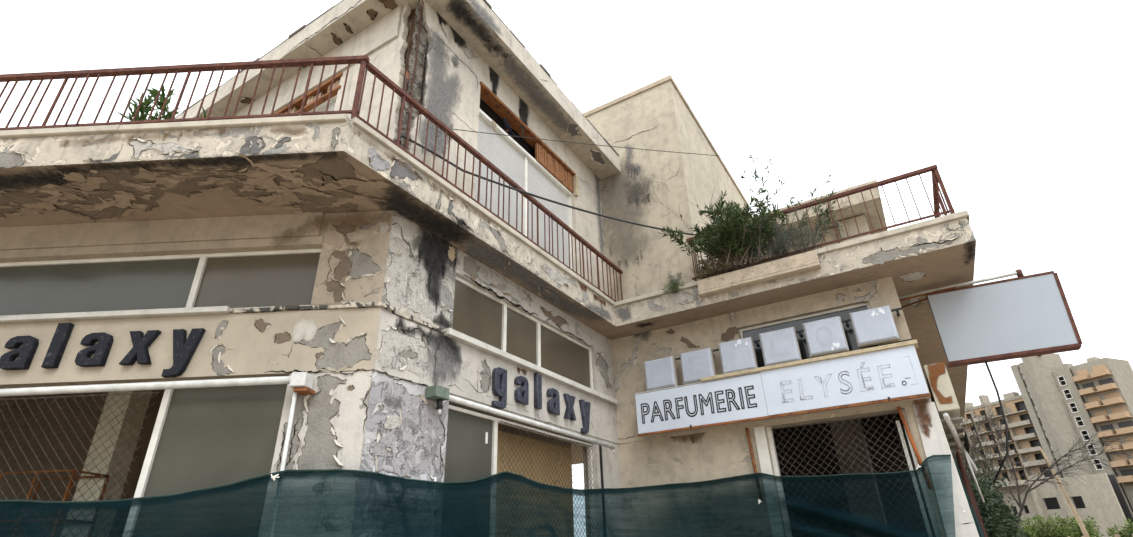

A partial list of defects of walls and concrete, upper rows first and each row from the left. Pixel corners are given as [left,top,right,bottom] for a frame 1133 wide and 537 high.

water stain [421,0,568,154]
peeling [0,0,452,323]
peeling [436,189,470,232]
water stain [312,175,652,385]
peeling [448,224,570,327]
water stain [626,148,640,176]
peeling [862,233,963,265]
peeling [209,320,234,376]
peeling [254,316,445,482]
peeling [479,359,492,394]